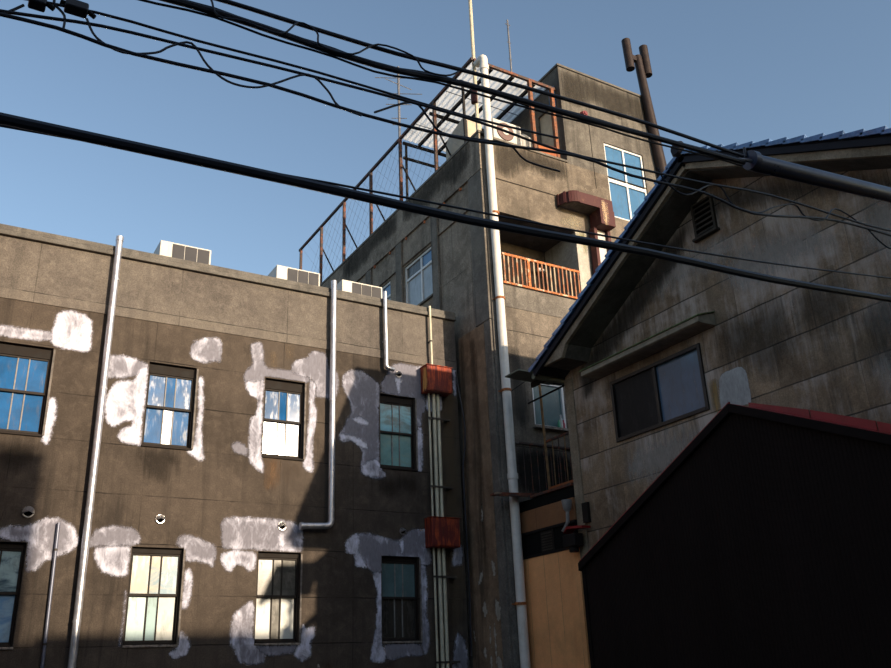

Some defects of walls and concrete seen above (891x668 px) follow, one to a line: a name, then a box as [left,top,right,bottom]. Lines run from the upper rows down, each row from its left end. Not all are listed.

water stain [495,146,565,175]
peeling [0,311,92,351]
peeling [190,337,222,363]
water stain [580,227,689,397]
peeling [43,398,57,444]
peeling [105,355,148,445]
peeling [188,377,204,460]
peeling [232,342,442,479]
peeling [177,516,304,609]
peeling [230,602,315,665]
peeling [345,529,432,663]